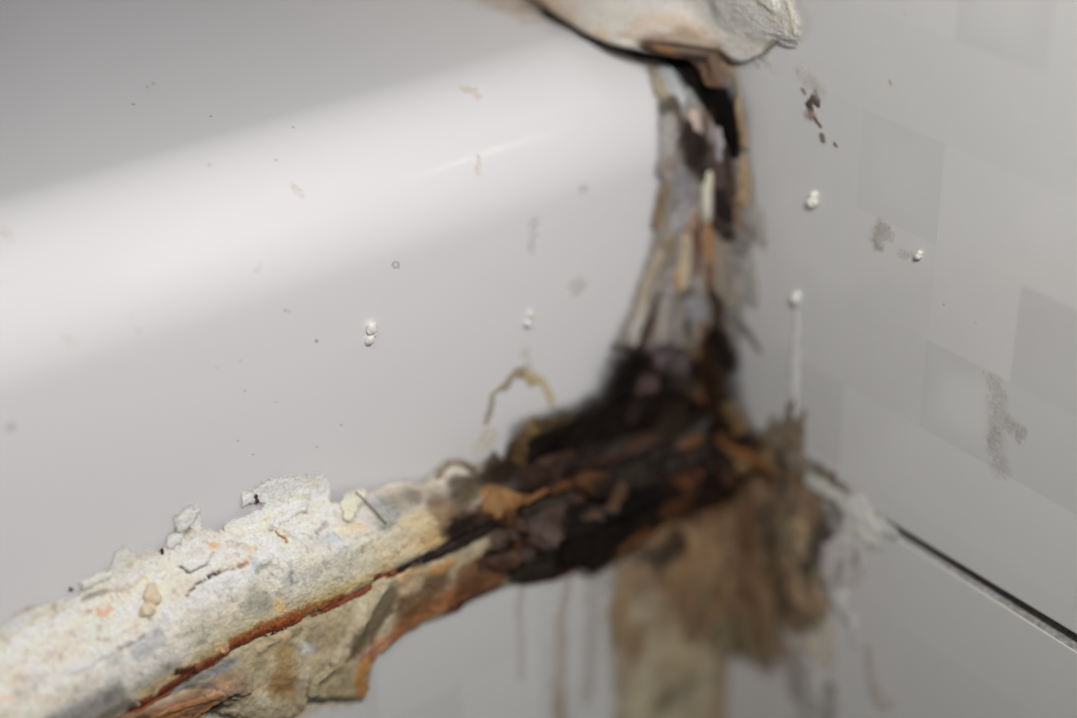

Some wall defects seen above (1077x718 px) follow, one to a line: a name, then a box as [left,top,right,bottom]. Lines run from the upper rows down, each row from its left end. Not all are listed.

water stain [801,87,837,147]
peeling [241,491,256,507]
peeling [339,489,368,521]
water stain [480,328,851,718]
peeling [307,656,372,700]